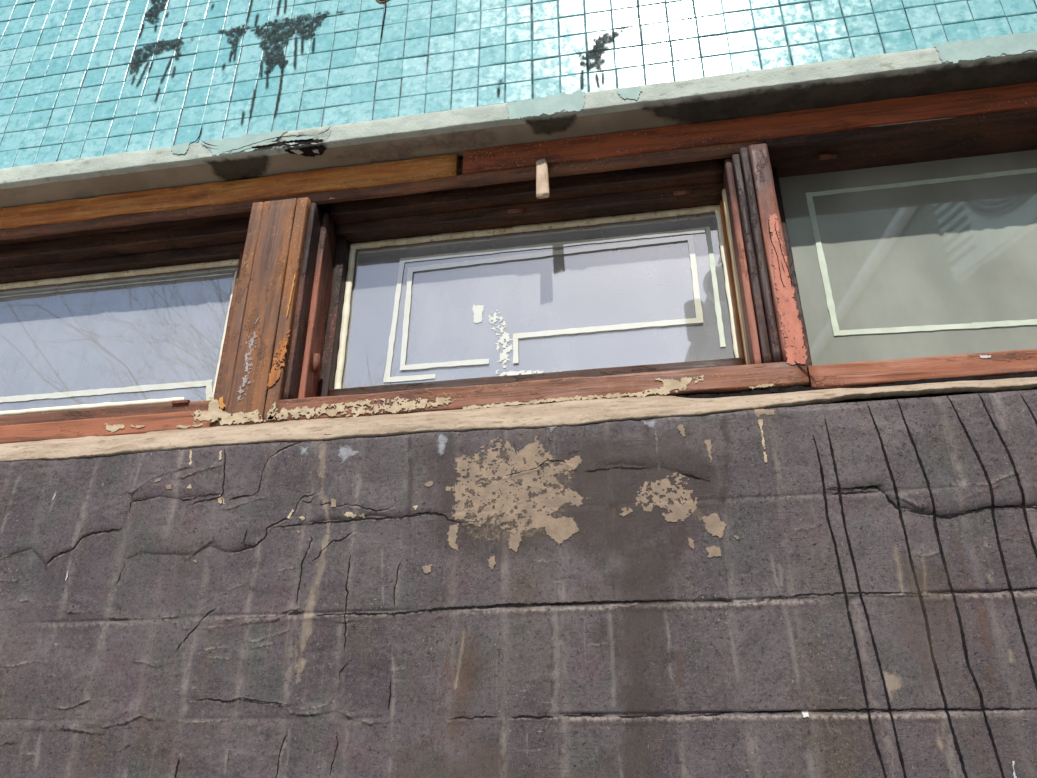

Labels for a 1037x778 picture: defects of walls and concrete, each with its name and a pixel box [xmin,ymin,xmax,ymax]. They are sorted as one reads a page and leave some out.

leakage [208,155,268,181]
leakage [241,35,315,124]
leakage [526,115,575,134]
leakage [644,58,1037,123]
peeling [768,213,808,365]
peeling [177,317,704,428]
crack [182,434,331,504]
peeling [446,436,588,552]
peeling [620,472,739,558]
crack [231,493,680,678]
crack [675,360,1037,778]
crack [452,712,665,720]